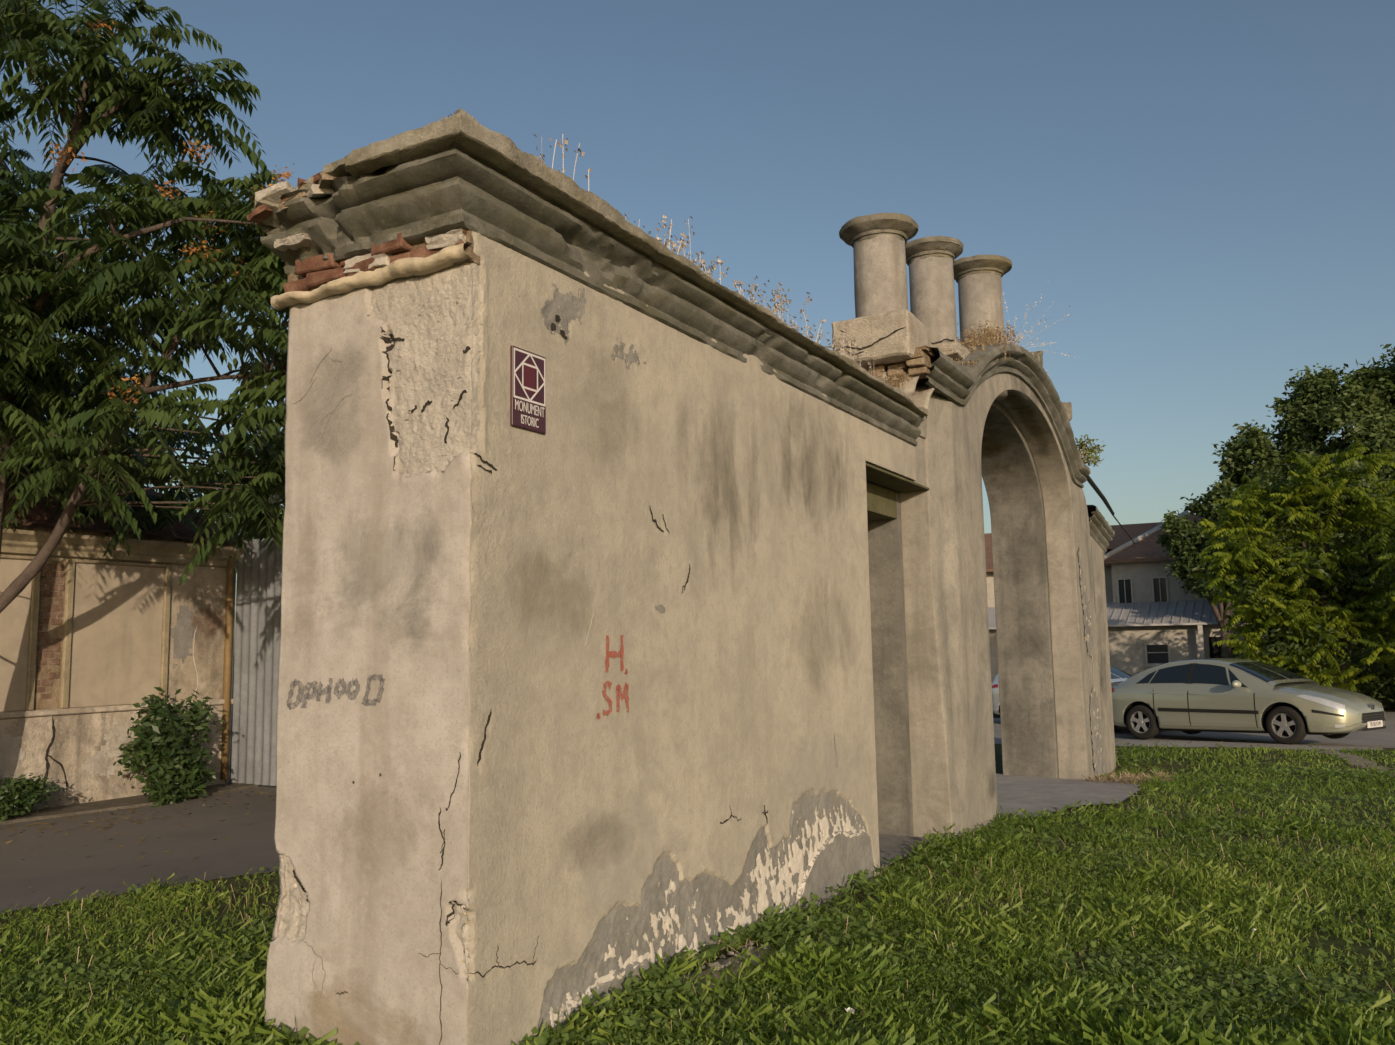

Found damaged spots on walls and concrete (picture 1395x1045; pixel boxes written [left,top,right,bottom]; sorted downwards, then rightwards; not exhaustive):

spalling [246,158,352,228]
flaking render [283,228,485,477]
peeling [541,283,586,344]
flaking render [866,350,933,385]
flaking render [272,855,309,943]
crack [418,708,539,1045]
flaking render [445,901,474,981]